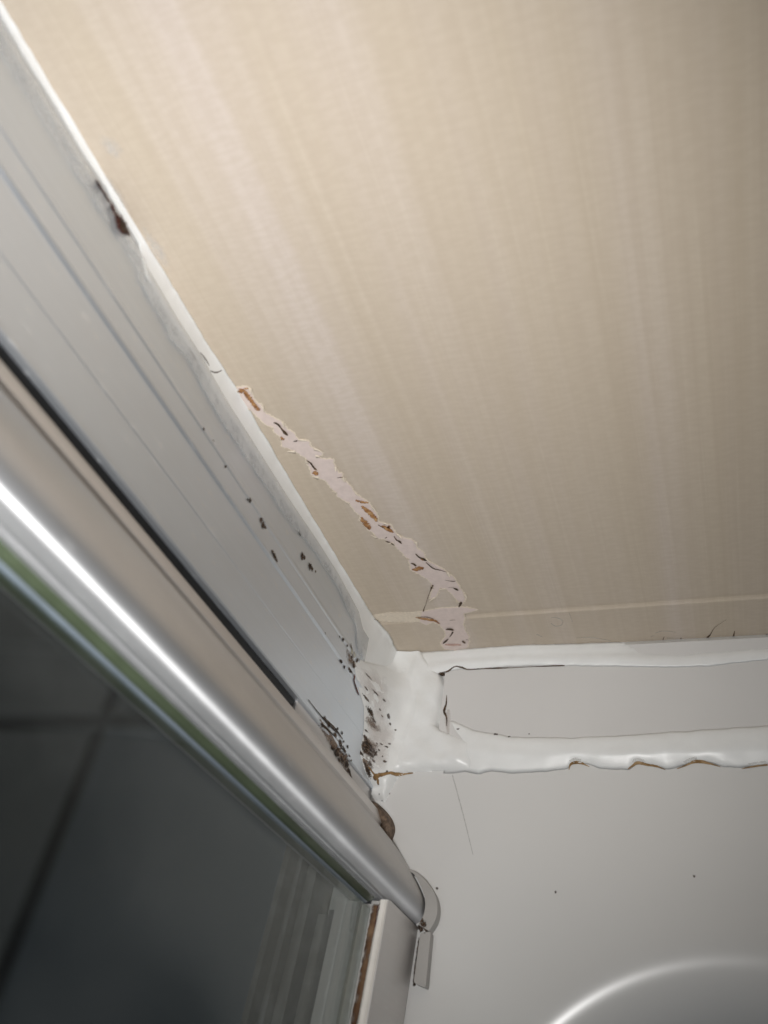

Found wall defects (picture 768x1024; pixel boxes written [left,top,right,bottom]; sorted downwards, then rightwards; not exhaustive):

leakage [95,180,130,236]
peeling [236,385,478,651]
leakage [308,636,396,781]
crack [439,665,565,726]